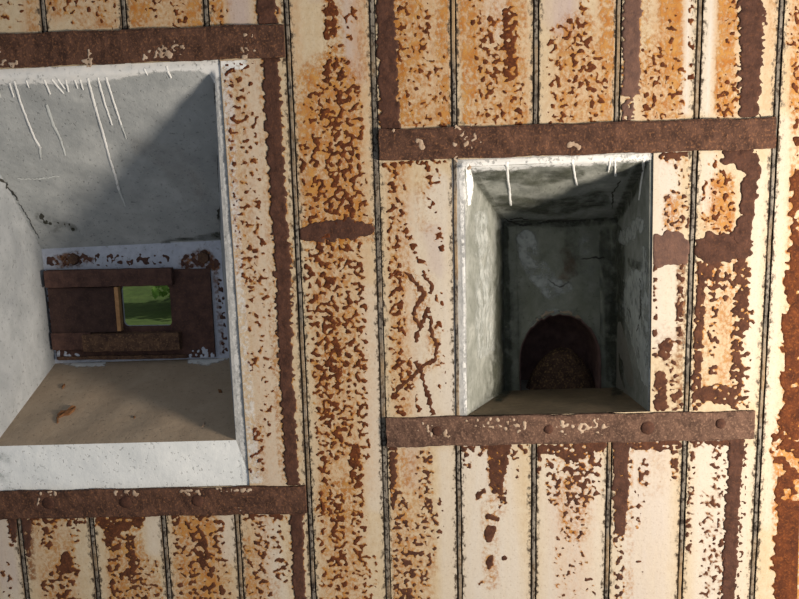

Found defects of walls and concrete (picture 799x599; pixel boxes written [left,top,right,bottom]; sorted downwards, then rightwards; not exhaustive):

leakage [8,81,42,160]
leakage [43,77,127,207]
corrosion [459,0,527,126]
corrosion [546,0,695,124]
corrosion [714,0,768,119]
corrosion [223,0,378,599]
corrosion [382,159,446,417]
leakage [465,159,608,401]
corrosion [652,149,762,412]
corrosion [769,165,799,599]
corrosion [7,517,163,599]
corrosion [461,439,748,599]